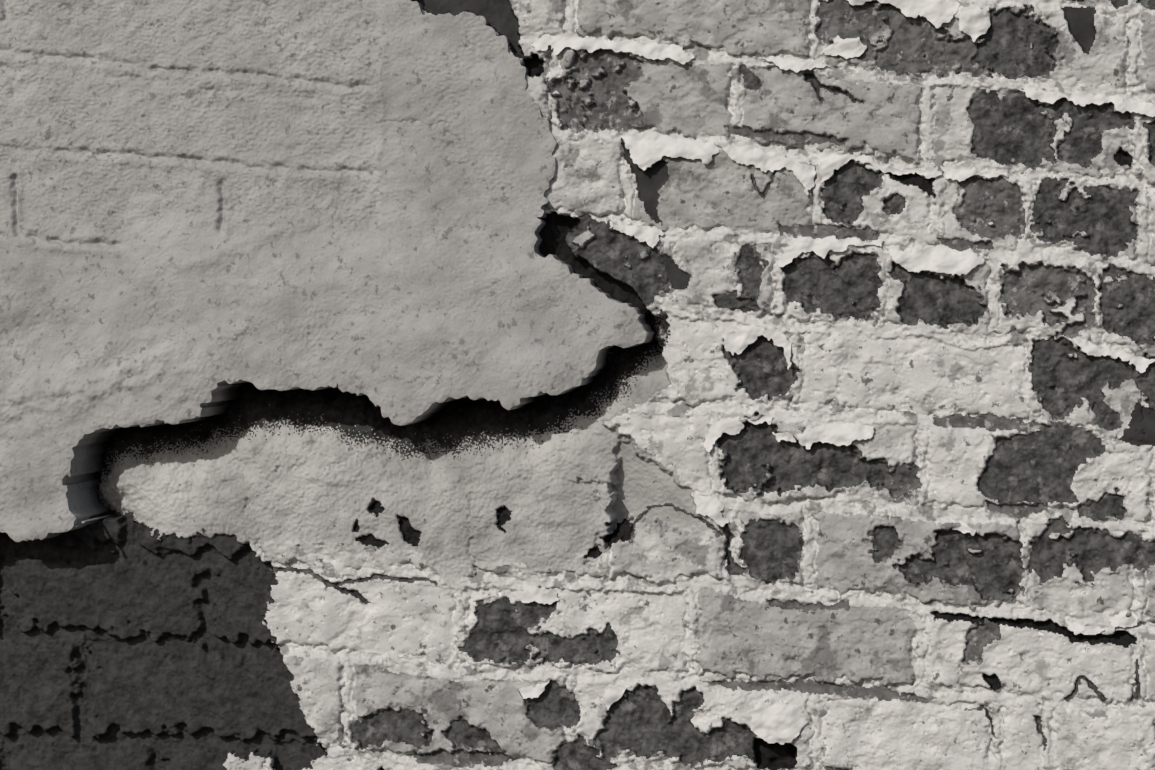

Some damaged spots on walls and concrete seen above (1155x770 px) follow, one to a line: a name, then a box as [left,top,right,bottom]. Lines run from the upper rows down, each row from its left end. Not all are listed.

spalling [704,0,1155,602]
flaking render [0,31,719,770]
crack [269,565,438,604]
spalling [458,587,808,770]
spalling [962,617,1002,691]
peeling [1066,610,1137,635]